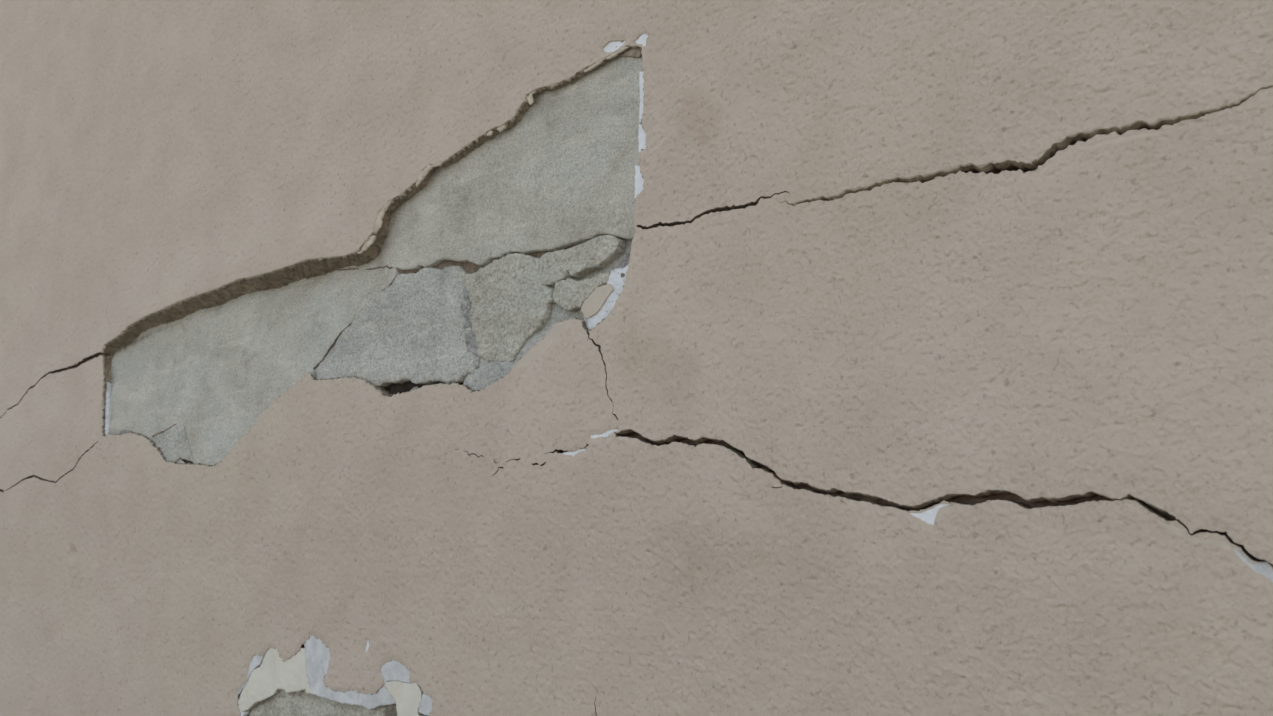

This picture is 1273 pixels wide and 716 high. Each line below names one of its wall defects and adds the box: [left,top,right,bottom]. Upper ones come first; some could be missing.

crack [320,85,1273,300]
spalling [100,32,648,467]
crack [0,352,109,418]
crack [313,323,352,369]
crack [0,441,98,492]
crack [455,322,1273,568]
spalling [236,635,433,716]